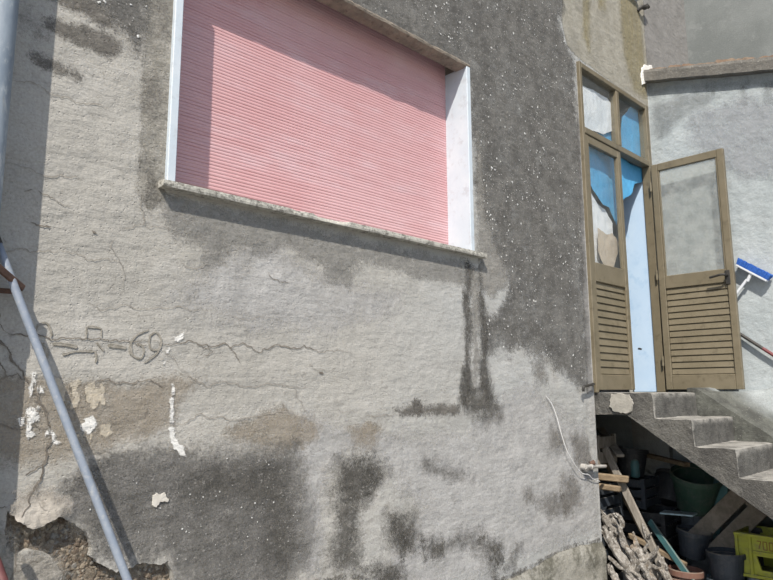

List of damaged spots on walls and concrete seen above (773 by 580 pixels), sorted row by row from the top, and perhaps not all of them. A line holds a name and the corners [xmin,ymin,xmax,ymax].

damp [29,52,83,83]
damp [44,0,120,60]
crack [3,196,211,311]
damp [149,177,502,422]
peeling [28,372,44,396]
peeling [68,379,106,409]
damp [0,377,189,463]
peeling [90,423,112,440]
crack [0,315,351,499]
flaking render [0,483,170,580]
damp [63,408,317,580]
damp [330,458,401,580]